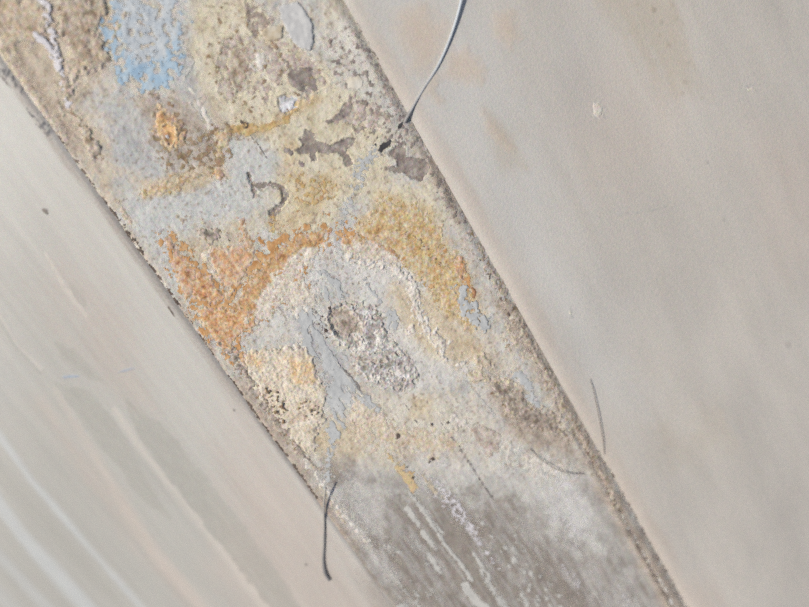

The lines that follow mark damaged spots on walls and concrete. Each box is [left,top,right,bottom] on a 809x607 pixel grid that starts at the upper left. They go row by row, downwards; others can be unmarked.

peeling [0,61,56,141]
peeling [205,0,468,241]
rust [238,303,303,354]
peeling [292,259,386,492]
peeling [450,284,490,334]
rust [537,346,555,375]
peeling [438,406,517,467]
damp [426,475,502,571]